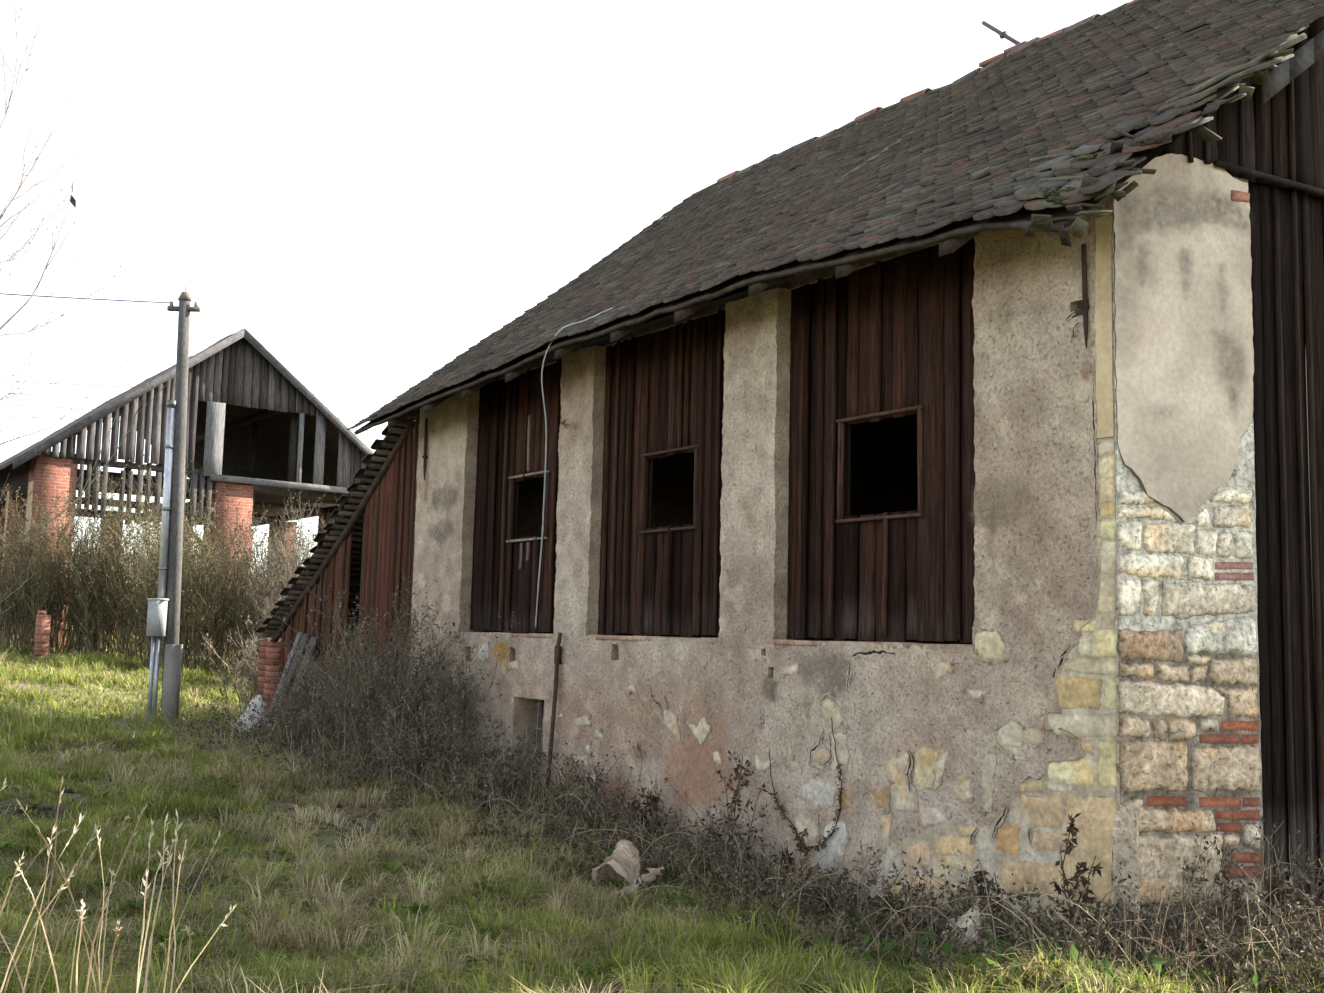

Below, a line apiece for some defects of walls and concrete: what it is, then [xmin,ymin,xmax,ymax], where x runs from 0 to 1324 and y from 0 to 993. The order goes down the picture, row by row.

spalling [866,46,1294,954]
spalling [781,663,799,679]
spalling [663,709,723,766]
spalling [753,754,775,773]
spalling [795,693,852,879]